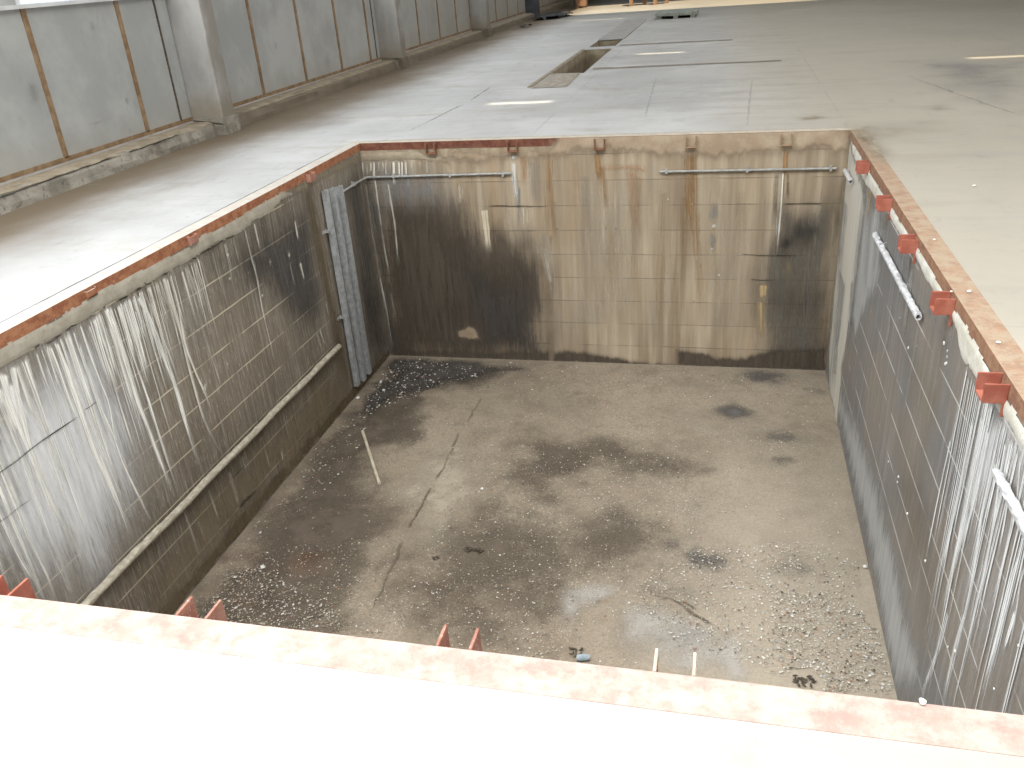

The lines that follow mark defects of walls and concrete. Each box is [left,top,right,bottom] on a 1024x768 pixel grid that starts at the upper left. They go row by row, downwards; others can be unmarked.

efflorescence [0,260,211,583]
leakage [158,154,677,638]
crack [377,415,472,598]
leakage [678,143,885,421]
efflorescence [926,371,1024,713]